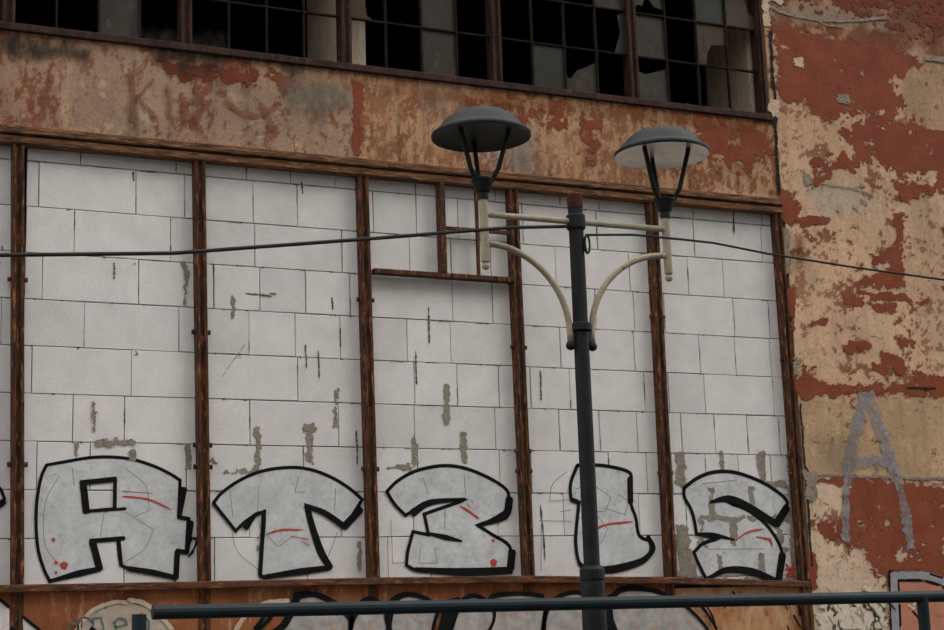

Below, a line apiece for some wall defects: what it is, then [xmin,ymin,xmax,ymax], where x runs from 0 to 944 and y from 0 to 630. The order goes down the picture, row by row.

peeling [156,55,307,106]
peeling [351,78,365,156]
peeling [466,92,606,167]
peeling [682,0,944,314]
peeling [787,286,797,337]
peeling [793,337,944,401]
peeling [802,469,944,591]